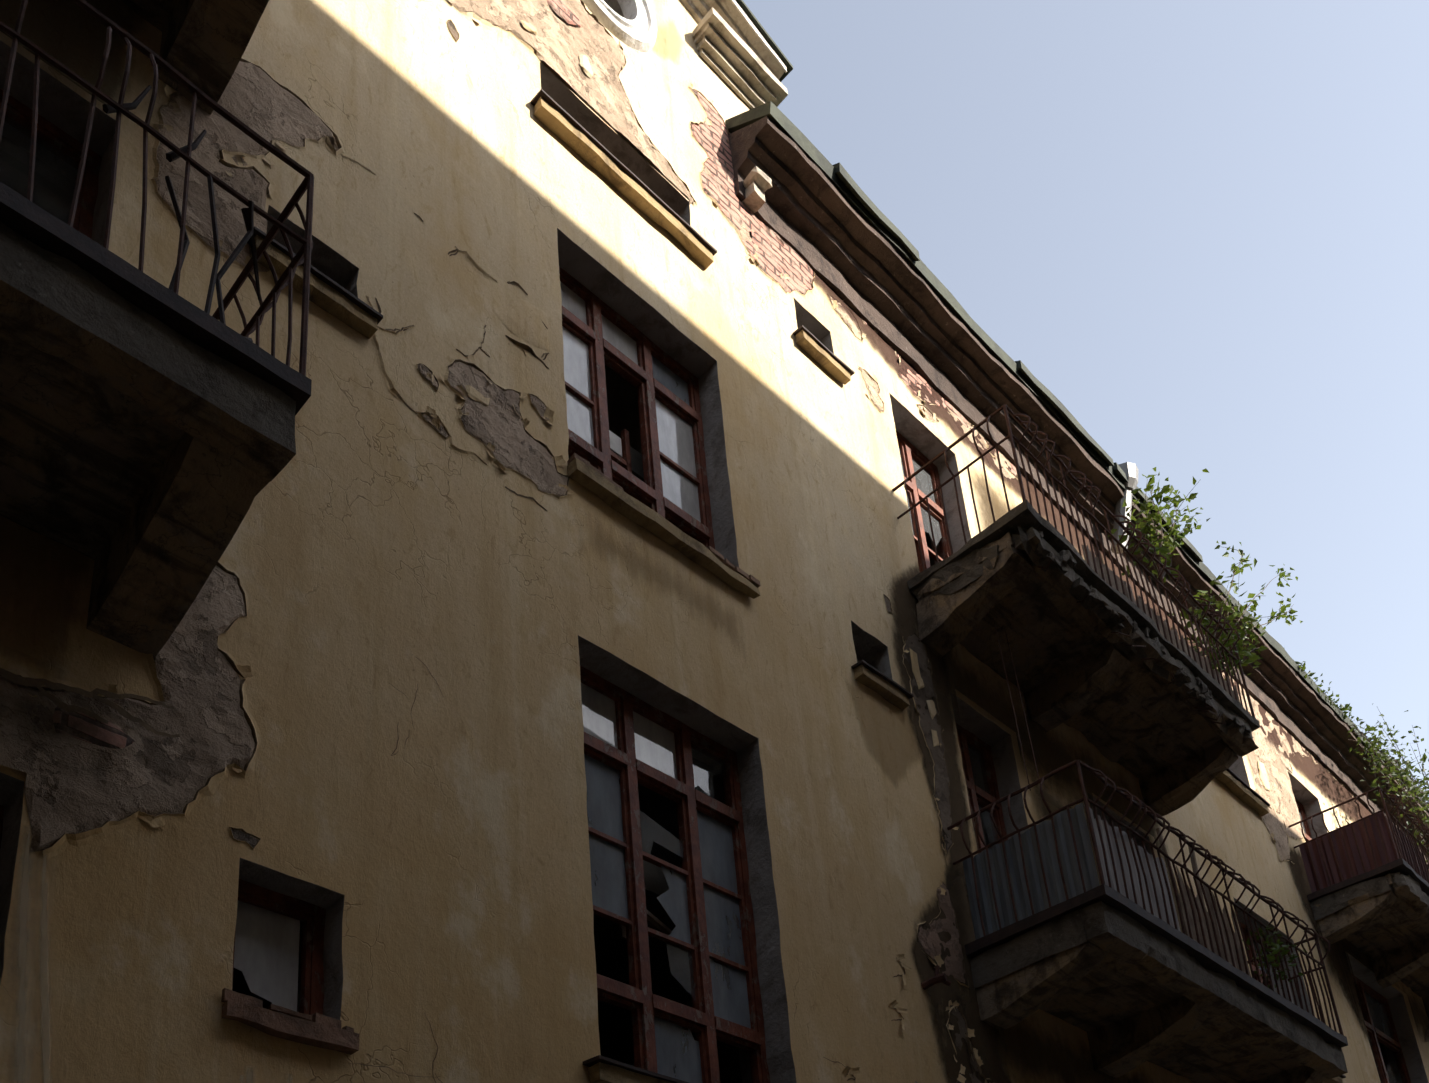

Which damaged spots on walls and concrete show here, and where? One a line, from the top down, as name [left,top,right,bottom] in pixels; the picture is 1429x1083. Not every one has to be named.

flaking render [147,57,346,282]
flaking render [442,0,877,343]
crack [365,295,547,511]
flaking render [415,353,573,501]
crack [447,246,550,369]
flaking render [858,366,885,414]
flaking render [895,350,1018,480]
flaking render [0,561,262,860]
flaking render [902,634,958,859]
flaking render [1217,668,1353,864]
flaking render [915,880,992,1083]